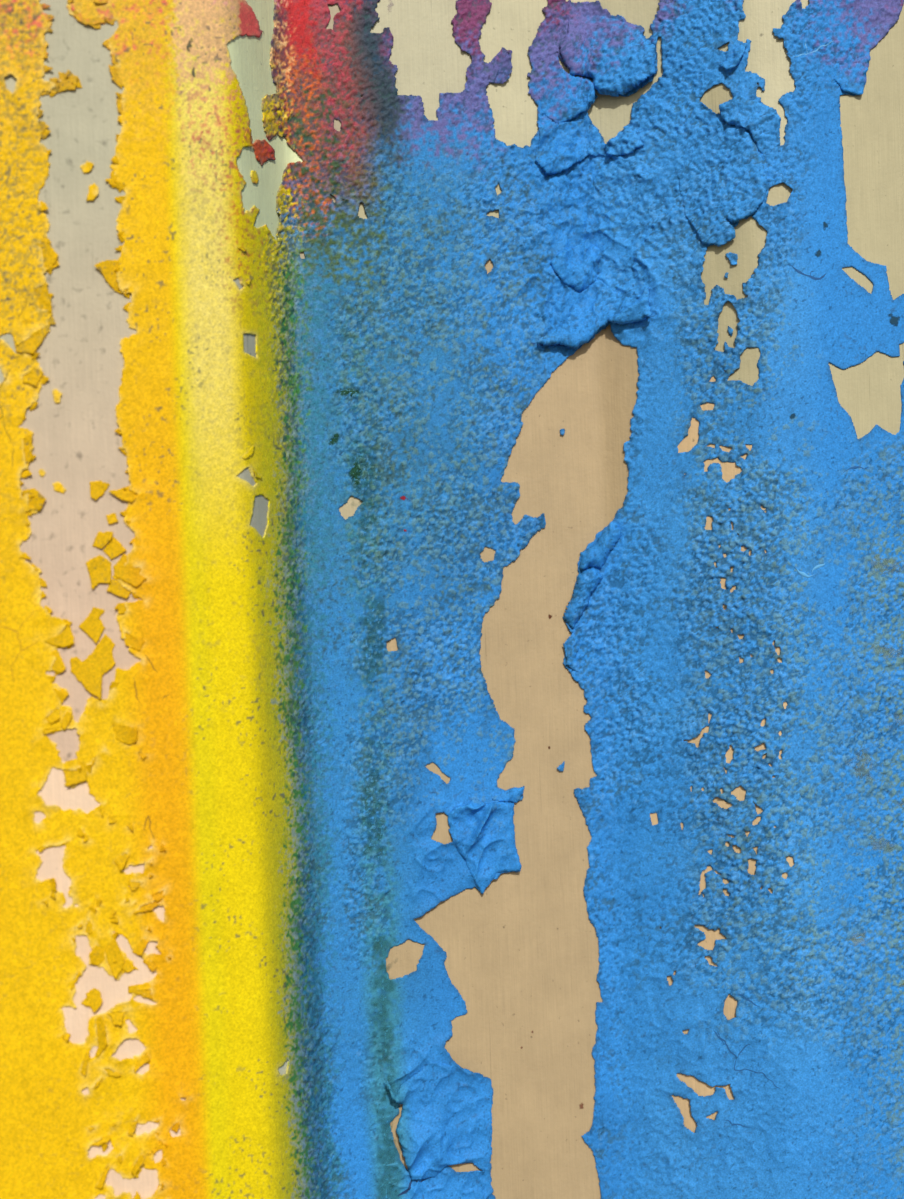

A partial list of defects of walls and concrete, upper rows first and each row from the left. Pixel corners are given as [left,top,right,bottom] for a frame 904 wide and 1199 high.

peeling [227,0,303,240]
peeling [370,0,548,148]
peeling [556,0,663,144]
peeling [718,0,809,146]
peeling [840,5,904,300]
peeling [701,216,767,386]
peeling [0,0,147,831]
peeling [677,402,752,482]
peeling [828,343,904,439]
peeling [386,324,639,1199]
peeling [36,828,171,1095]
peeling [672,1073,734,1133]